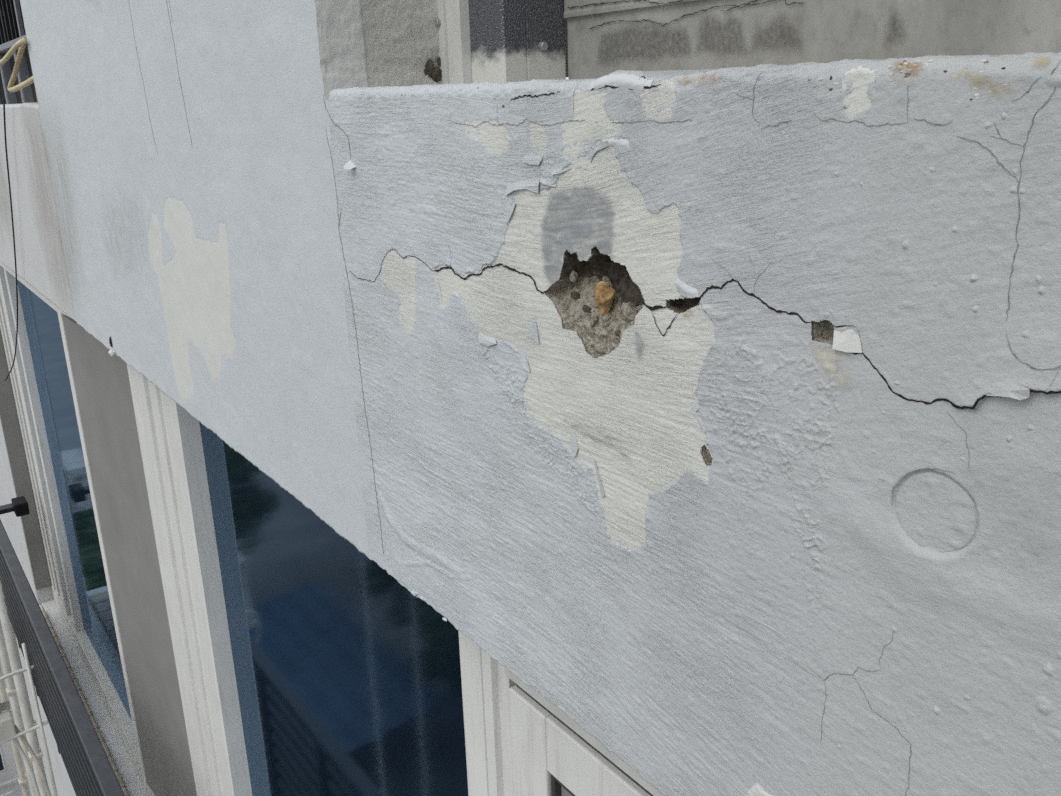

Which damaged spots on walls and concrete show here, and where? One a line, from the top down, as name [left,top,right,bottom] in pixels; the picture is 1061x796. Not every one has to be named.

crack [448,84,661,142]
crack [612,117,691,125]
crack [323,97,548,554]
peeling [432,88,716,551]
crack [642,301,676,336]
crack [698,59,1061,504]
peeling [748,782,773,796]
crack [820,634,911,796]